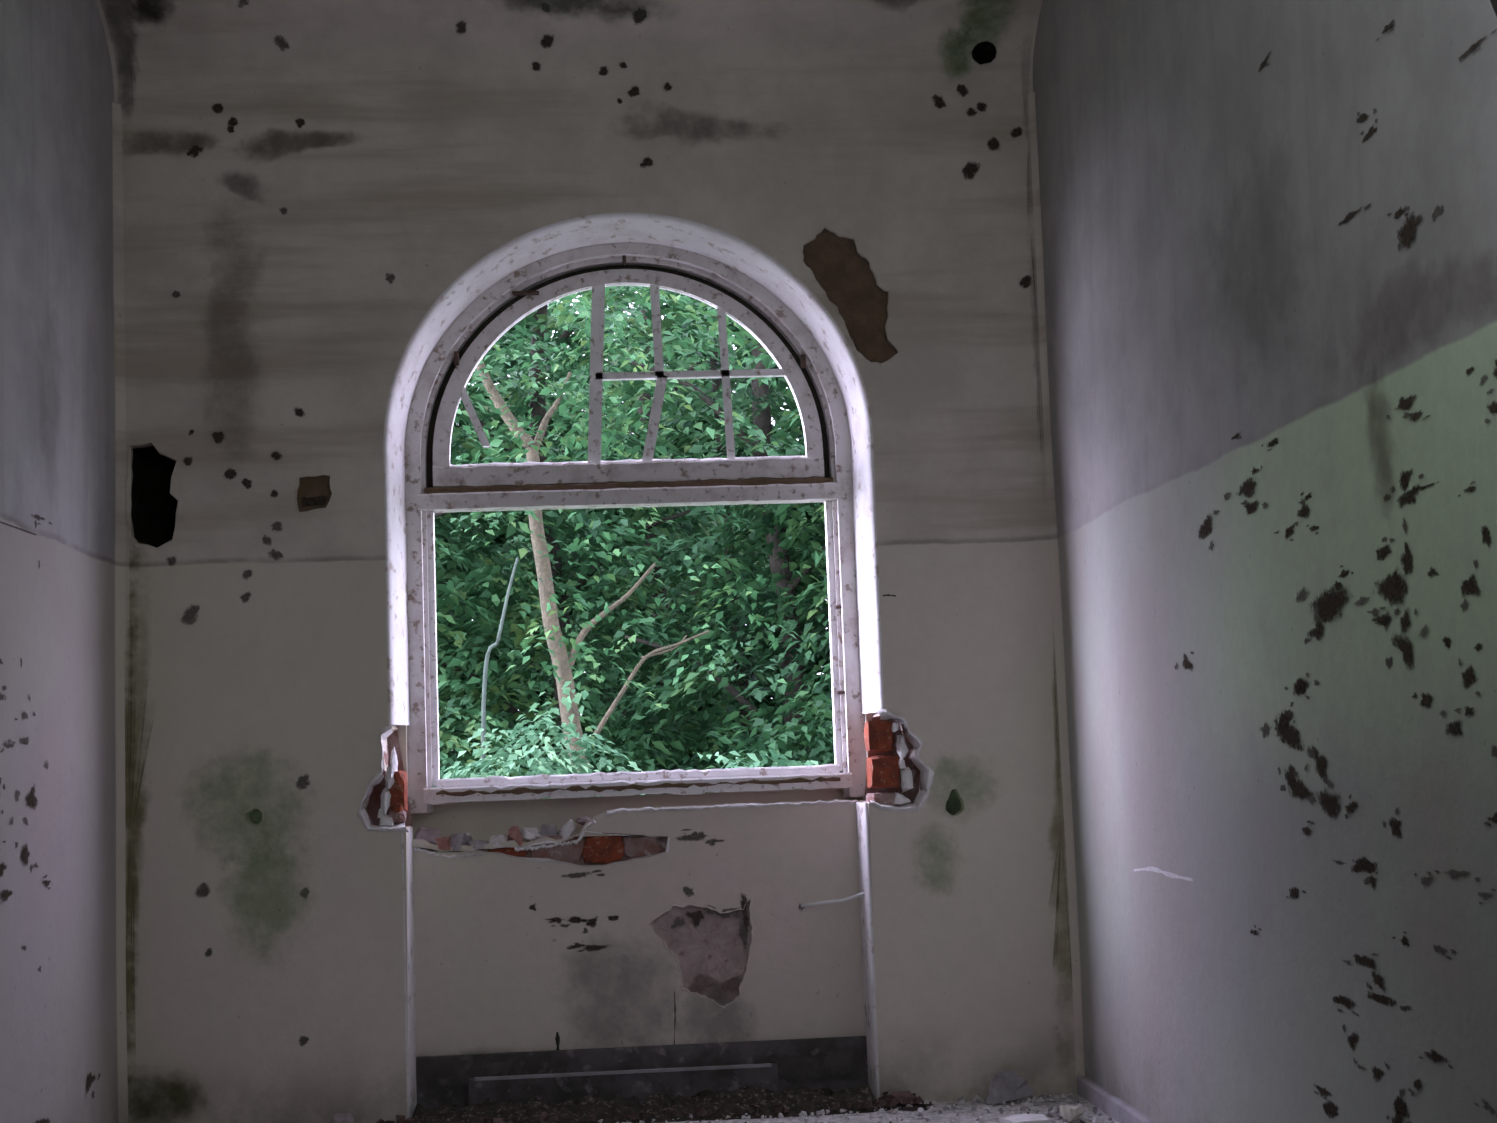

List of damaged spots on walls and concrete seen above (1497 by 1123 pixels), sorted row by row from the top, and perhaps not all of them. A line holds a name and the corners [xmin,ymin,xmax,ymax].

leakage [532,34,554,71]
leakage [512,0,647,23]
leakage [617,86,640,104]
flaking render [801,224,899,367]
spalling [124,441,184,550]
flaking render [294,474,334,513]
peeling [1199,438,1278,550]
peeling [1296,469,1451,669]
leakage [296,775,309,789]
flaking render [357,708,965,867]
leakage [196,882,209,897]
flaking render [648,895,755,1010]